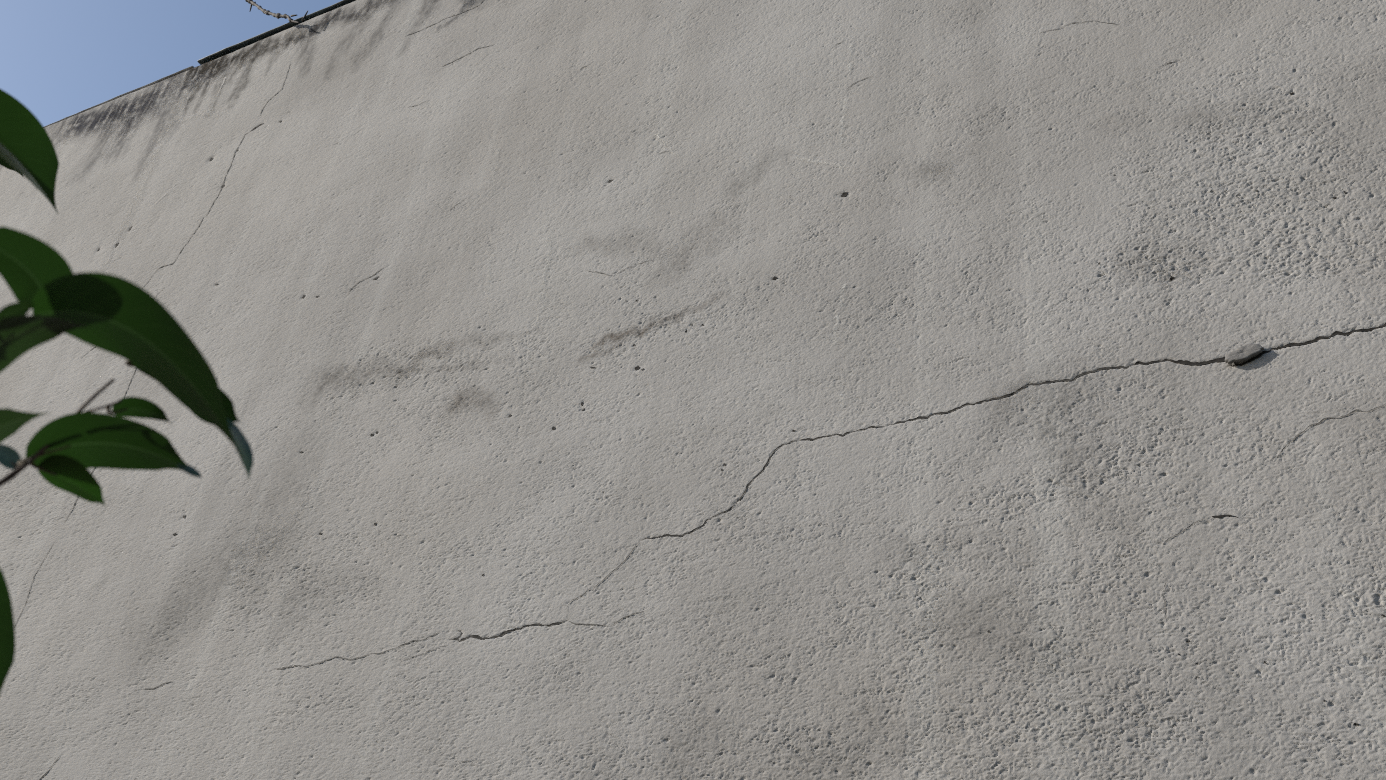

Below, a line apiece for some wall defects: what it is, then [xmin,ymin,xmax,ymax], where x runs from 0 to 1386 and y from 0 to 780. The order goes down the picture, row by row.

water stain [72,0,377,197]
crack [274,323,1386,669]